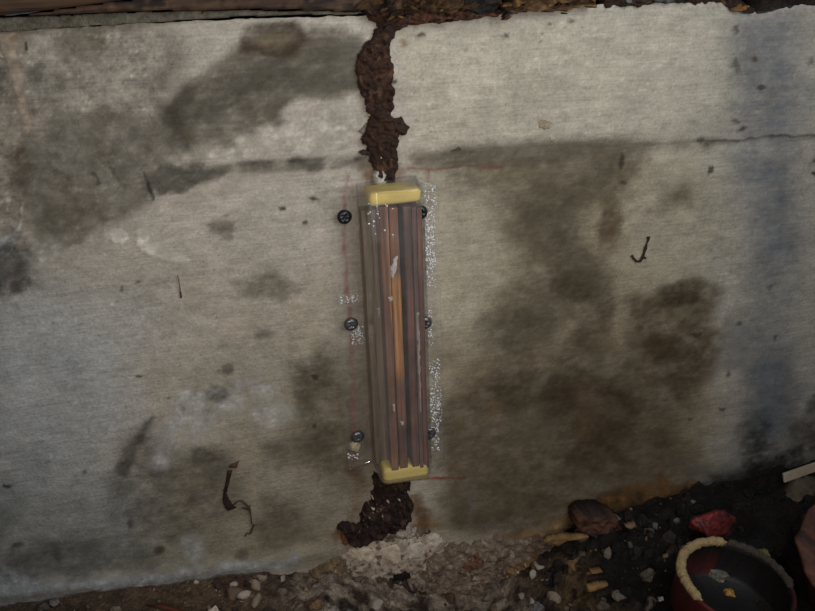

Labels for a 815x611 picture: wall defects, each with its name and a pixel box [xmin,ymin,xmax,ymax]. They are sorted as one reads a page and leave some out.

damp [0,8,362,201]
damp [32,218,190,264]
damp [478,144,636,327]
damp [454,280,714,524]
damp [694,408,815,487]